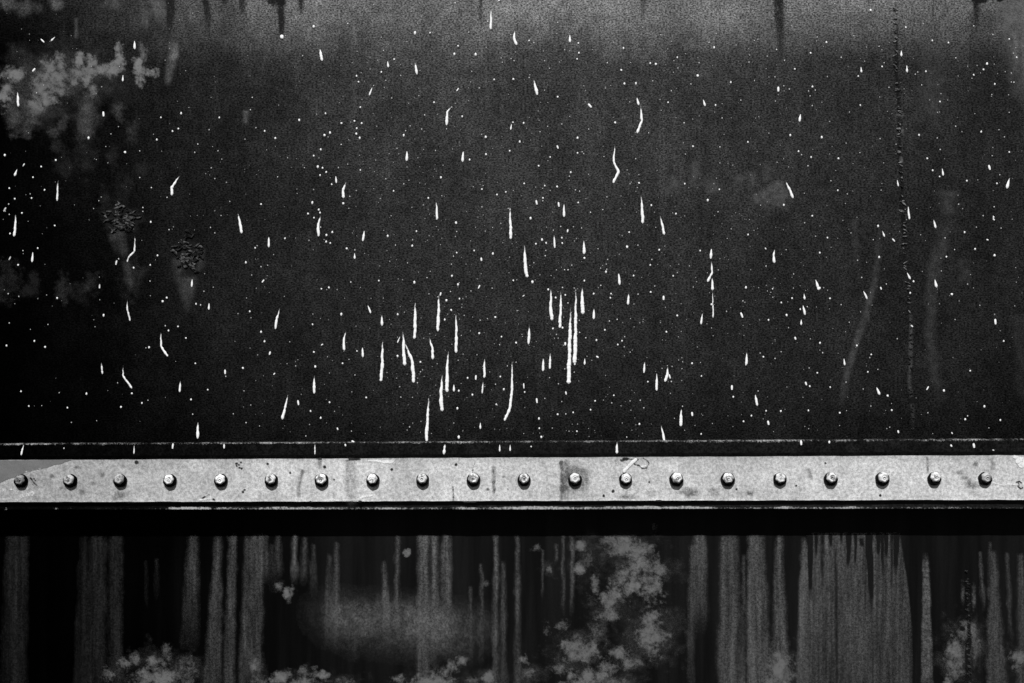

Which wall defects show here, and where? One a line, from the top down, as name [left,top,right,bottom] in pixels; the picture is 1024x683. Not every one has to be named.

water stain [268,0,285,35]
water stain [774,0,784,48]
water stain [418,536,450,615]
water stain [799,533,900,662]
water stain [922,562,931,677]